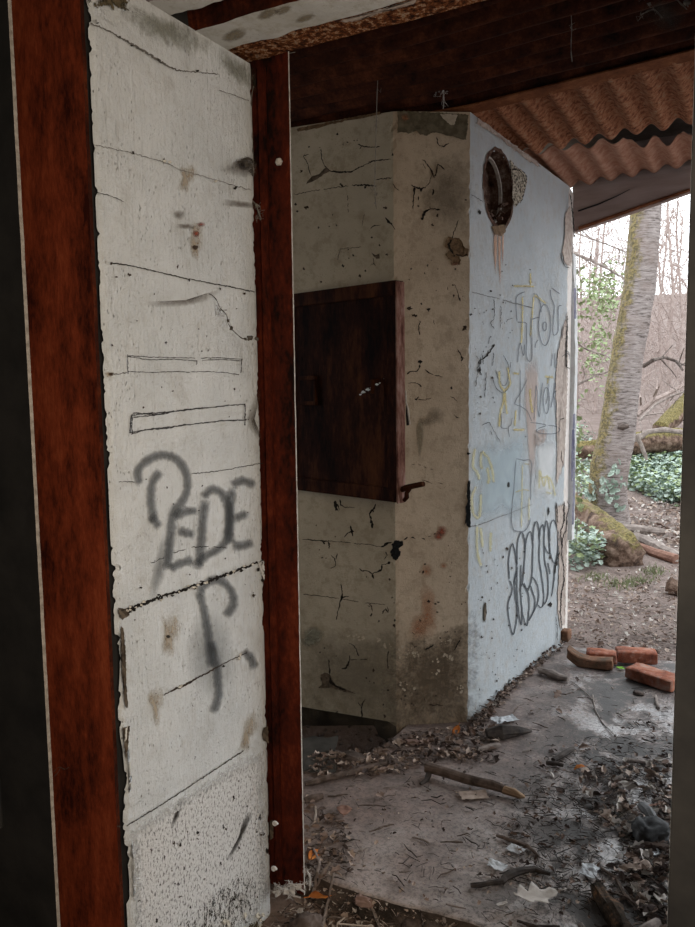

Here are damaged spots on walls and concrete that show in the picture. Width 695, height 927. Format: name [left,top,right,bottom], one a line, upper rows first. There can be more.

crack [91,22,249,101]
crack [293,137,449,229]
crack [110,262,254,292]
spalling [445,221,469,270]
rust [492,224,506,270]
crack [120,559,265,617]
crack [303,500,389,620]
crack [164,652,247,695]
leakage [391,630,473,725]
crack [127,750,244,826]